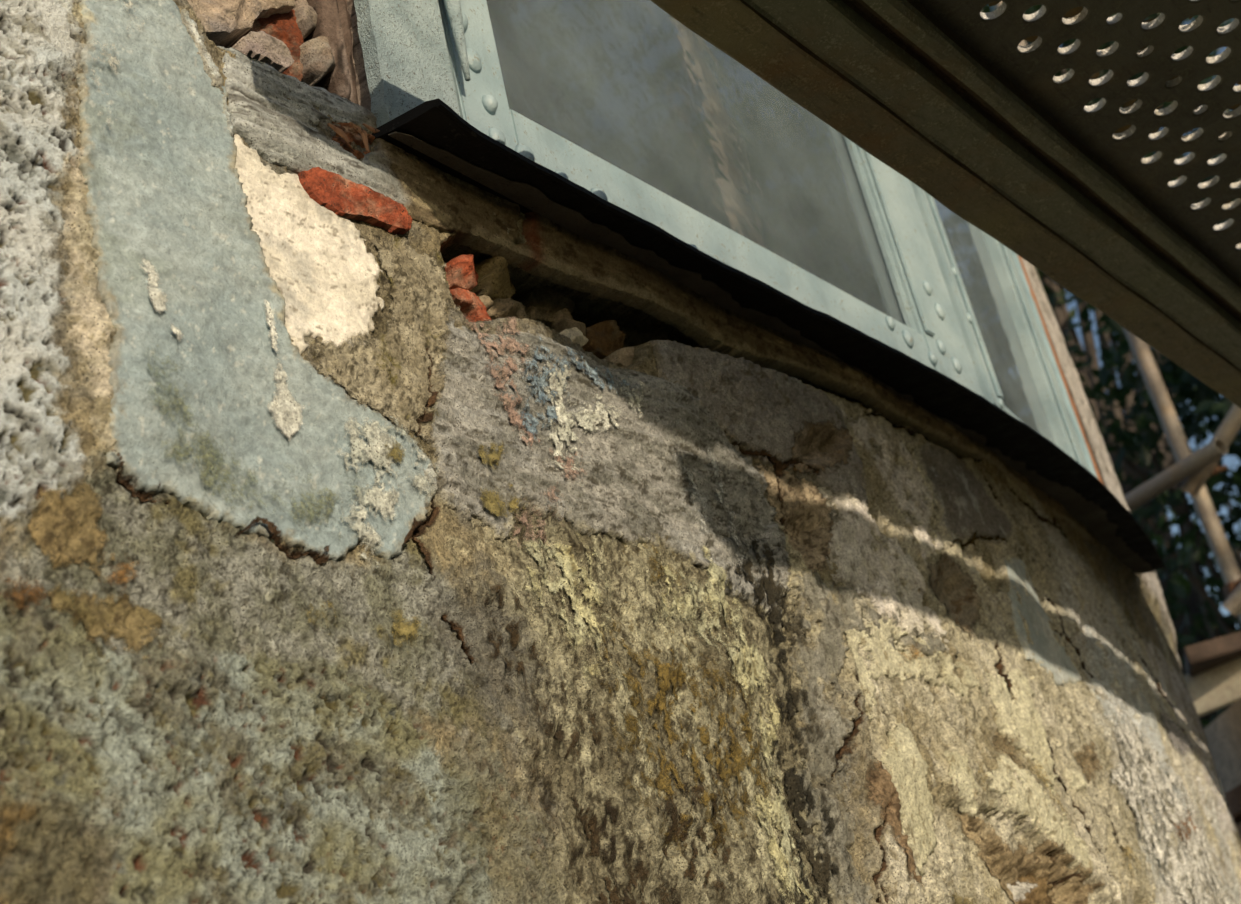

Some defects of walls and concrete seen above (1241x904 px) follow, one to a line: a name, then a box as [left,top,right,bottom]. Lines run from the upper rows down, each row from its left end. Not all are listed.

peeling [59,0,460,564]
crack [112,449,169,505]
crack [724,431,820,530]
crack [235,516,330,564]
crack [831,663,872,777]
crack [994,643,1014,699]
crack [1045,596,1093,678]
crack [872,790,896,904]